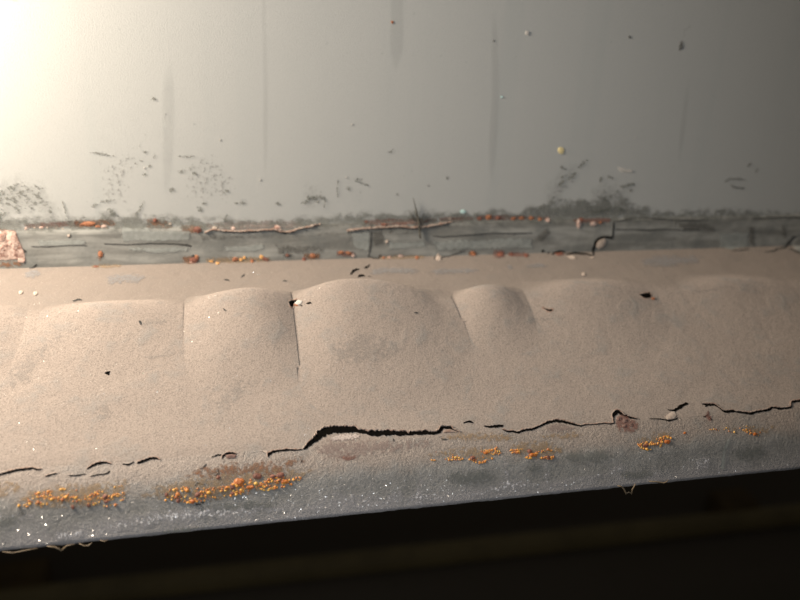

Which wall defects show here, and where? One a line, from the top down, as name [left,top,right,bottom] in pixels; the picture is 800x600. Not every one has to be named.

water stain [0,183,52,216]
rust [364,214,550,226]
peeling [0,229,25,263]
rust [182,255,270,265]
crack [541,217,707,259]
crack [262,398,800,463]
rust [431,432,579,464]
rust [0,481,127,516]
crack [0,456,160,477]
crack [195,451,237,486]
rust [143,459,305,504]
water stain [136,508,252,526]